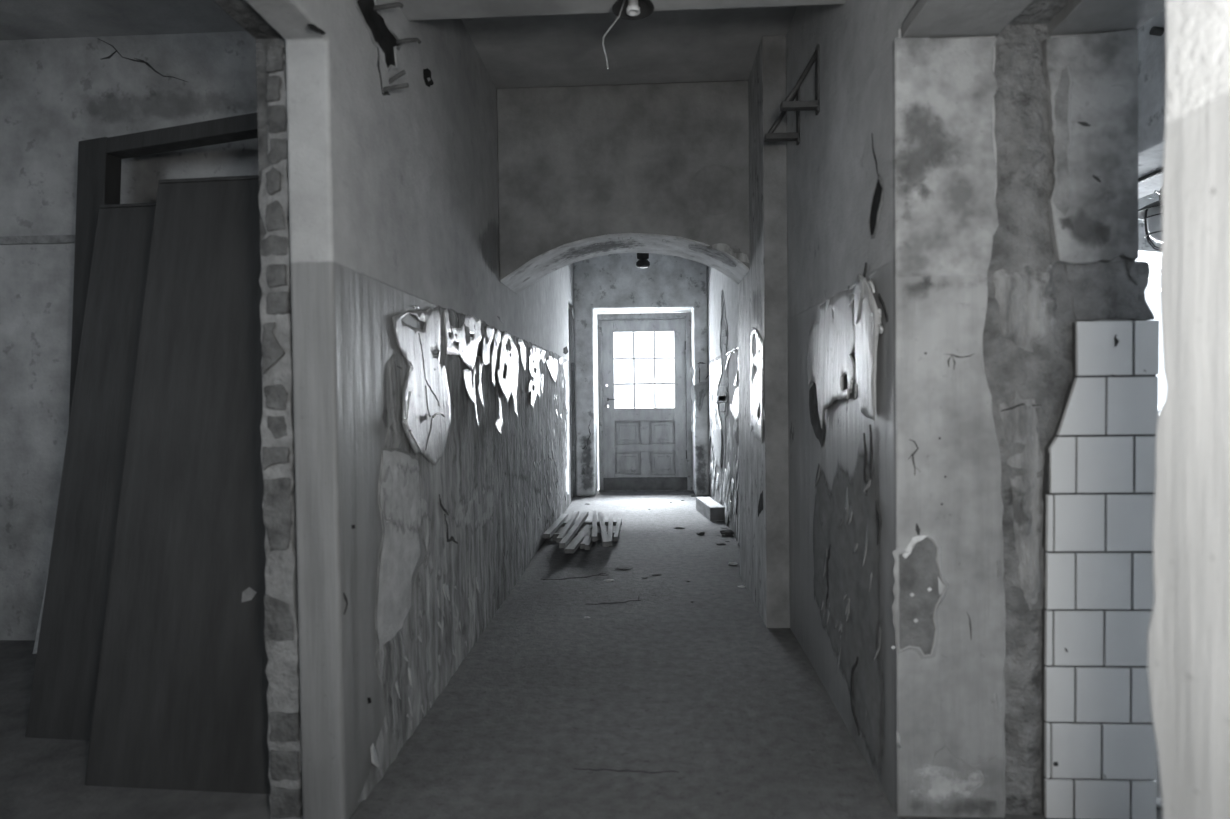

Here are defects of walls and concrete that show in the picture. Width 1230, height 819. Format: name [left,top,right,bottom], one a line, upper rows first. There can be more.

crack [97,38,189,83]
spalling [1064,259,1155,321]
flaking render [690,290,764,546]
flaking render [809,382,825,447]
flaking render [357,305,568,803]